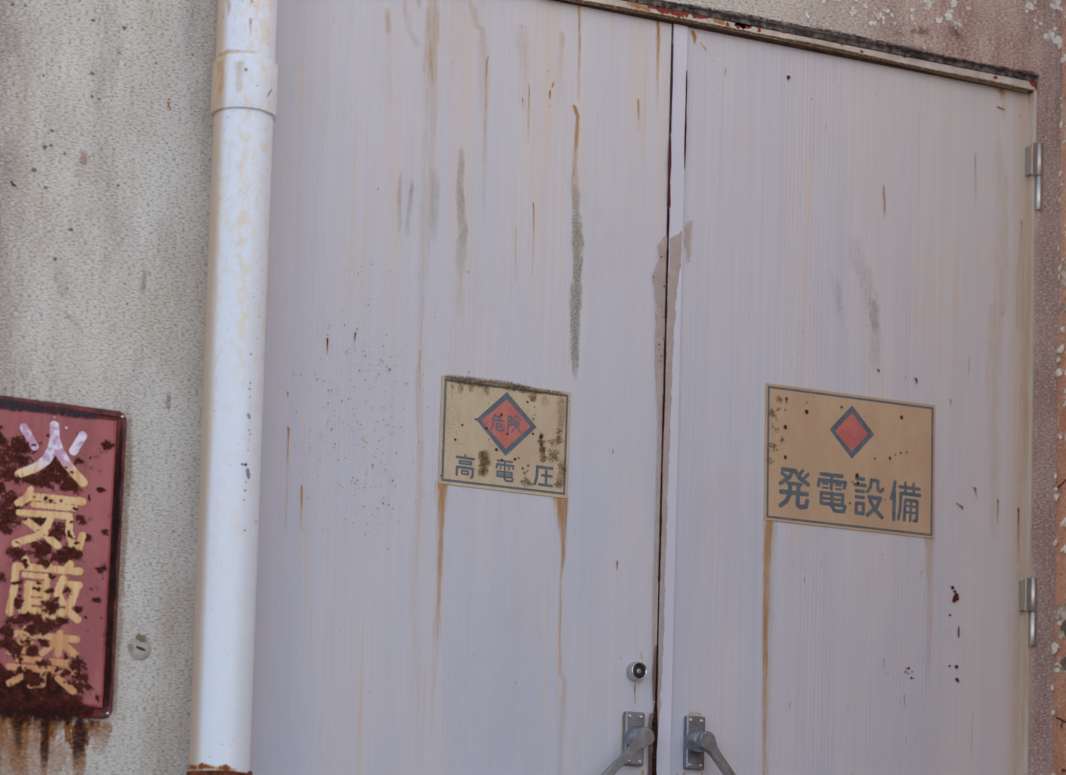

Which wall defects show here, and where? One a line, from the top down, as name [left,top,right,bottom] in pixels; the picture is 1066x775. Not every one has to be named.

leakage [571,218,583,367]
leakage [652,220,693,727]
corrosion [556,498,567,563]
spalling [1054,601,1066,640]
spalling [1053,653,1066,674]
corrosion [0,714,111,775]
corrosion [189,763,235,771]